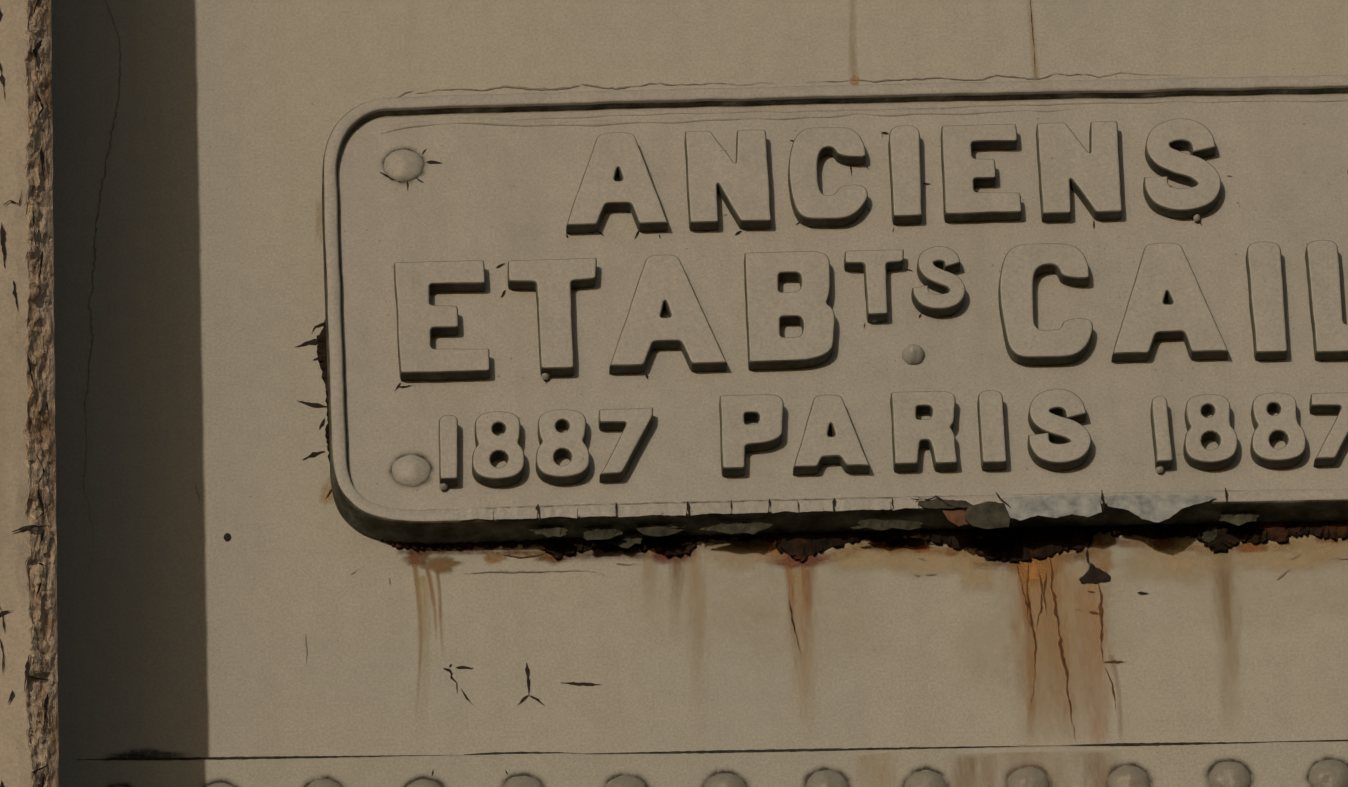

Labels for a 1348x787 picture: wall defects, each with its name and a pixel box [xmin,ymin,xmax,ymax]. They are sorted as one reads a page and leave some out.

peeling [23,0,59,787]
peeling [381,495,1348,563]
rust [408,550,601,632]
peeling [1079,563,1111,584]
rust [633,534,1348,740]